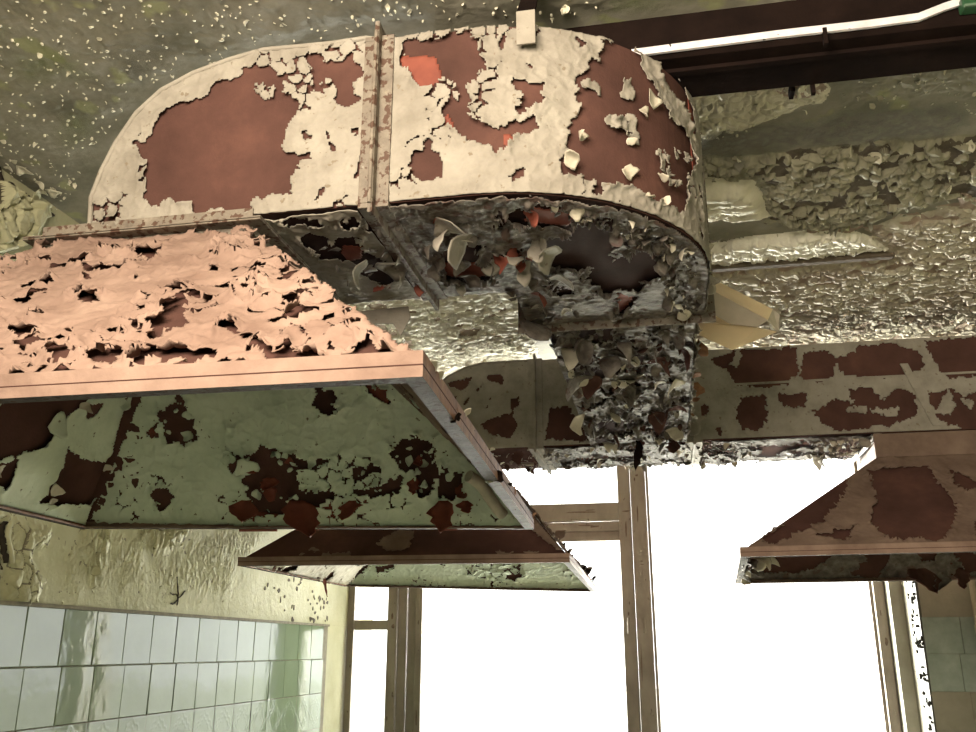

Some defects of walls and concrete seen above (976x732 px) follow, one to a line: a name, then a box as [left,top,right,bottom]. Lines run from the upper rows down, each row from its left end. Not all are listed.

peeling [91,38,368,226]
peeling [0,170,53,253]
peeling [348,24,976,478]
peeling [48,411,69,439]
peeling [180,411,193,441]
peeling [49,483,66,505]
peeling [221,450,260,477]
peeling [405,455,429,489]
peeling [445,470,467,499]
peeling [737,557,780,585]